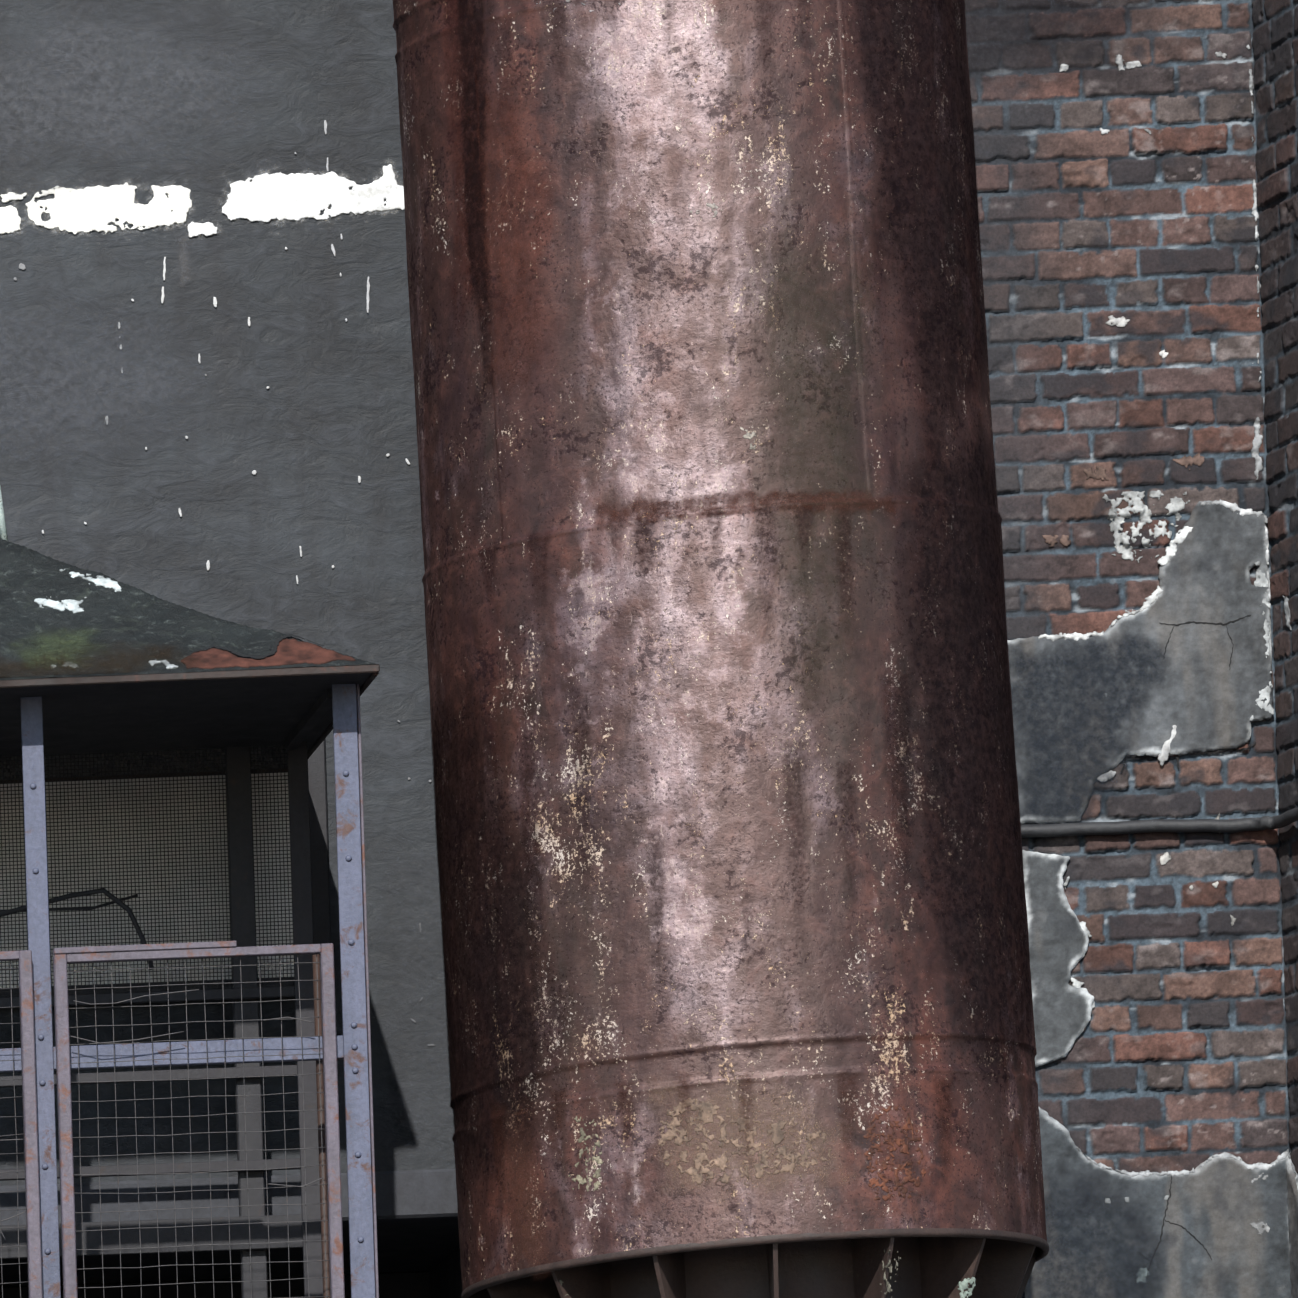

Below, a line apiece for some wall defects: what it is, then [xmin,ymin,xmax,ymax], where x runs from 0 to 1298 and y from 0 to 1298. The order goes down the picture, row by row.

peeling [0,164,405,237]
spalling [1172,453,1204,470]
corrosion [598,492,895,537]
spalling [1042,535,1071,547]
spalling [1157,526,1193,566]
spalling [1201,499,1271,610]
spalling [1038,585,1163,642]
corrosion [181,638,356,669]
crack [1160,615,1251,670]
spalling [1076,1147,1289,1177]